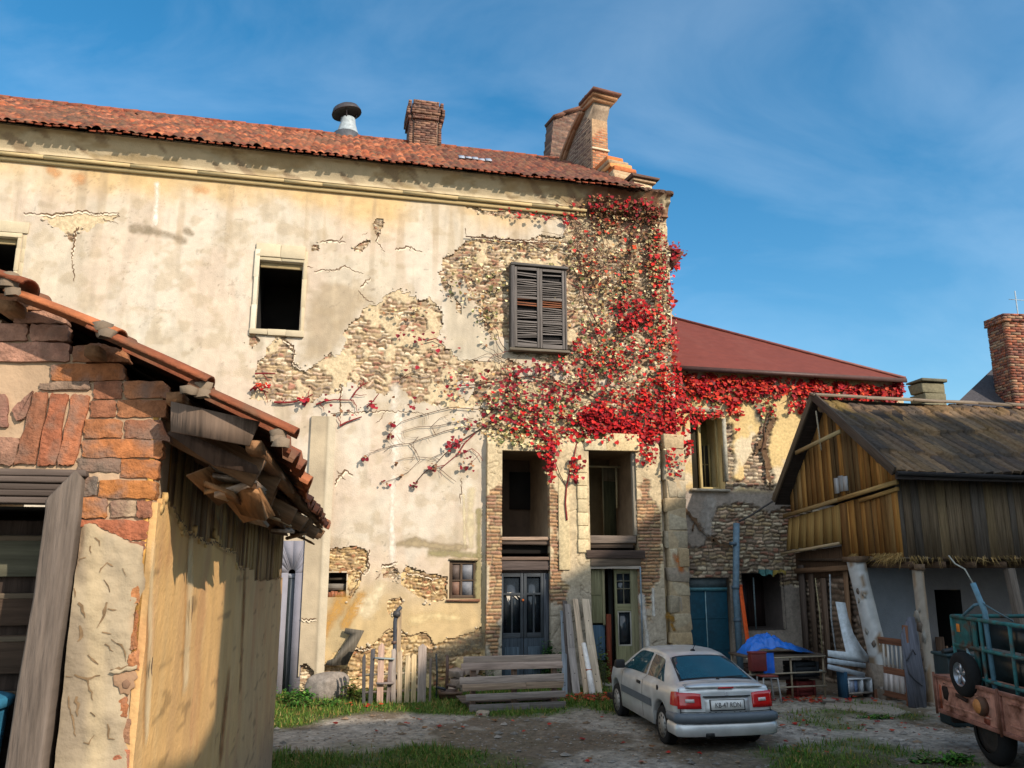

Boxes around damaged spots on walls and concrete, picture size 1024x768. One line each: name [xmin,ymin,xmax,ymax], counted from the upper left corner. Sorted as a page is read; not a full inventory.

crack [24,210,120,281]
crack [302,233,423,304]
flaking render [244,207,675,469]
flaking render [160,492,169,514]
flaking render [329,546,448,617]
flaking render [299,627,483,693]